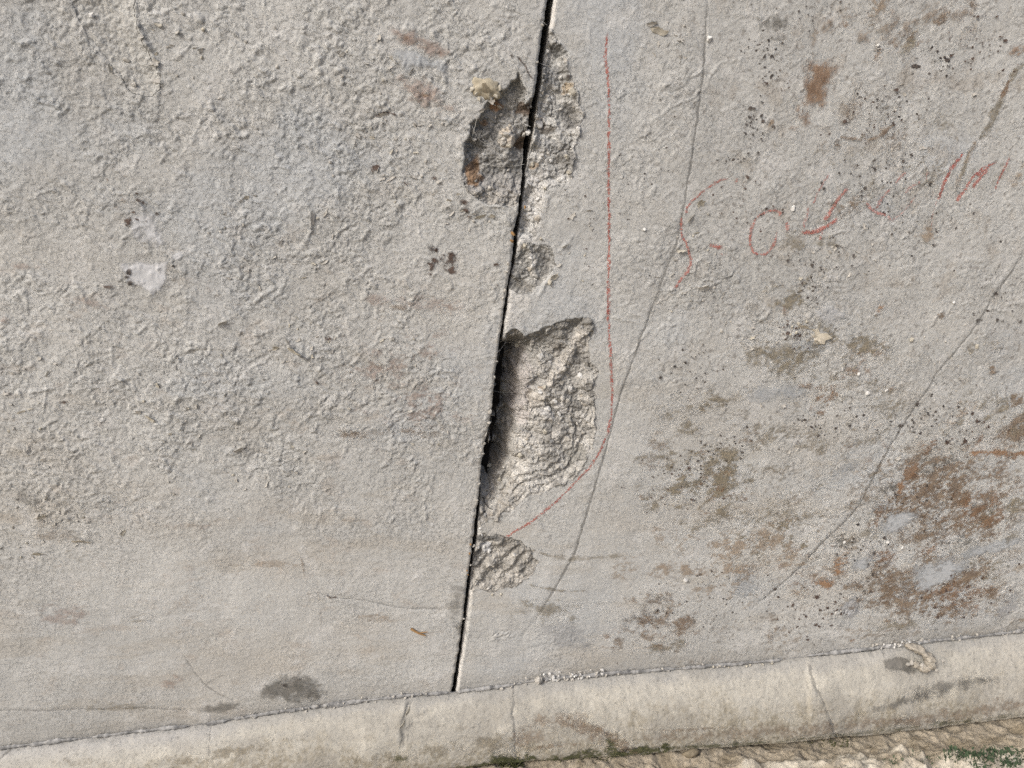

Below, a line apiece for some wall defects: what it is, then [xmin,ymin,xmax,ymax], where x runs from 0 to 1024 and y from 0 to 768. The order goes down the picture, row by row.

spalling [444,28,585,295]
crack [522,106,530,156]
crack [502,231,515,299]
crack [550,28,706,596]
crack [476,341,504,501]
spalling [470,317,598,596]
corrosion [963,444,1024,459]
leakage [262,677,320,702]